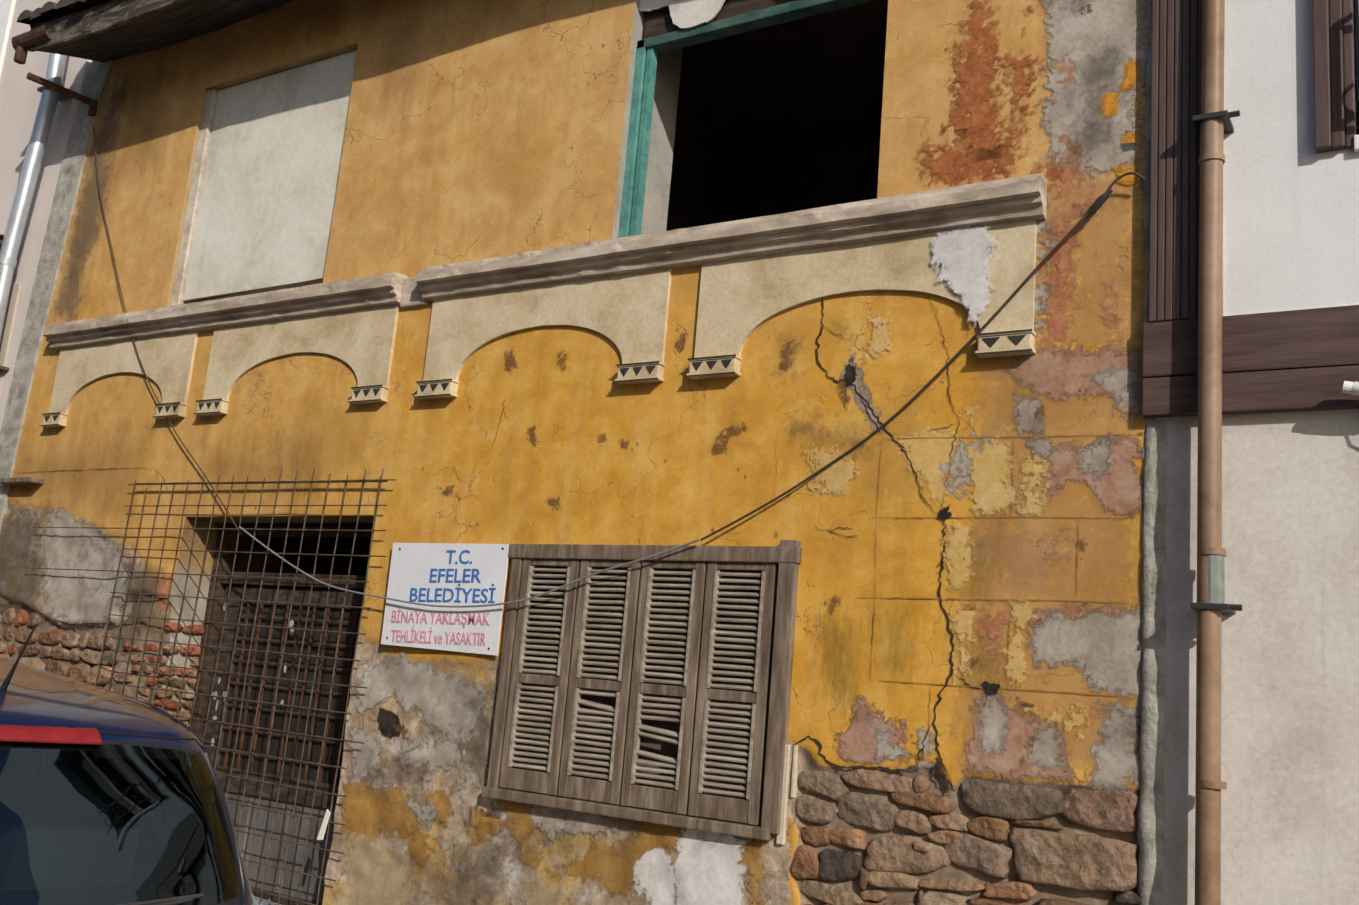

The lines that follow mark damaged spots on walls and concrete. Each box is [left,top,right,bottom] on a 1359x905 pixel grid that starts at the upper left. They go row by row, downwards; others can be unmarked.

peeling [834,0,1151,591]
peeling [802,443,861,496]
peeling [74,537,116,599]
crack [793,296,1001,792]
flaking render [114,581,204,727]
peeling [334,708,727,905]
peeling [737,838,771,905]
peeling [834,695,935,775]
spalling [950,597,1143,792]